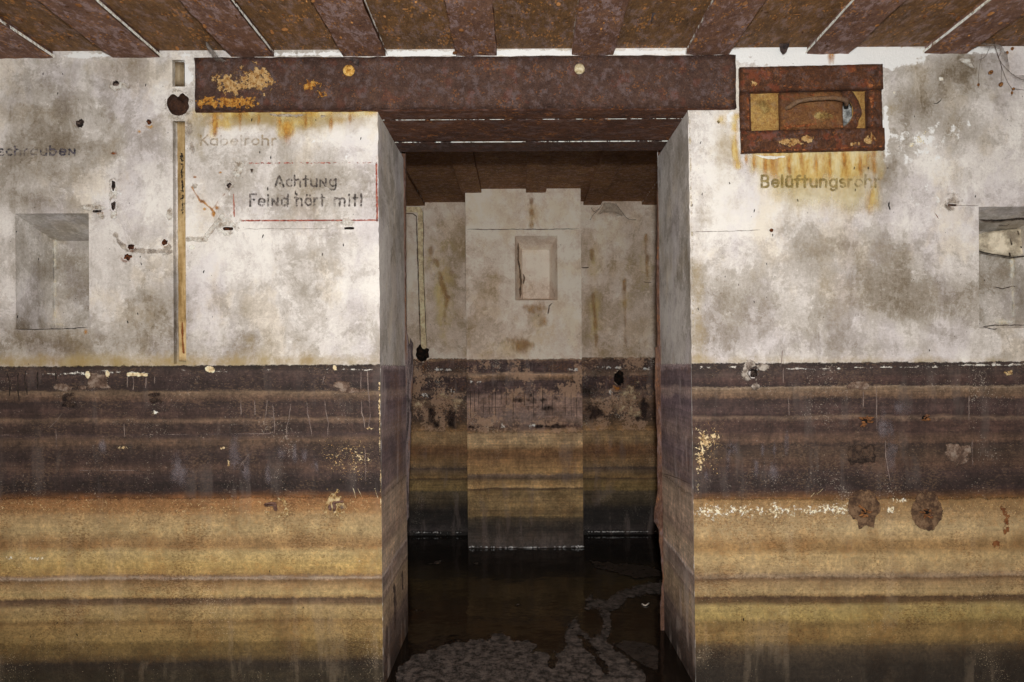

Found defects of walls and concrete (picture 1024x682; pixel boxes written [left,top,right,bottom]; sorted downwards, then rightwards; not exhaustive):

spalling [167,89,194,153]
rust [203,112,260,133]
rust [274,111,374,135]
rust [719,115,877,206]
flaking render [741,360,769,390]
flaking render [323,489,345,519]
water stain [0,341,1024,682]